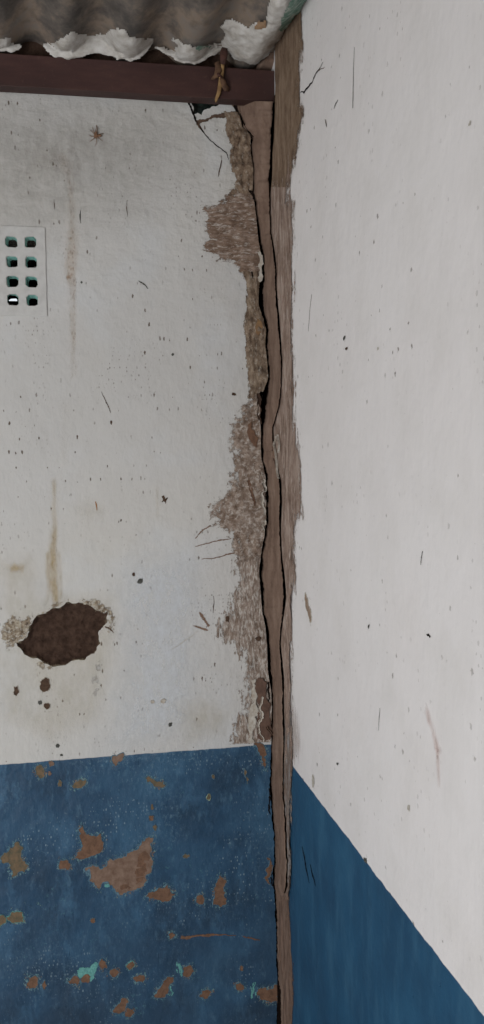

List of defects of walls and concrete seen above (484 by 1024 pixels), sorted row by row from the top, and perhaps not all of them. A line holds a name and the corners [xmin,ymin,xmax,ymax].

flaking render [191,9,312,1024]
crack [181,95,288,1024]
flaking render [1,599,115,710]
peeling [32,744,88,791]
peeling [109,752,128,769]
peeling [0,840,30,880]
peeling [56,804,178,904]
peeling [0,908,26,927]
peeling [23,973,47,993]
peeling [66,957,215,1020]